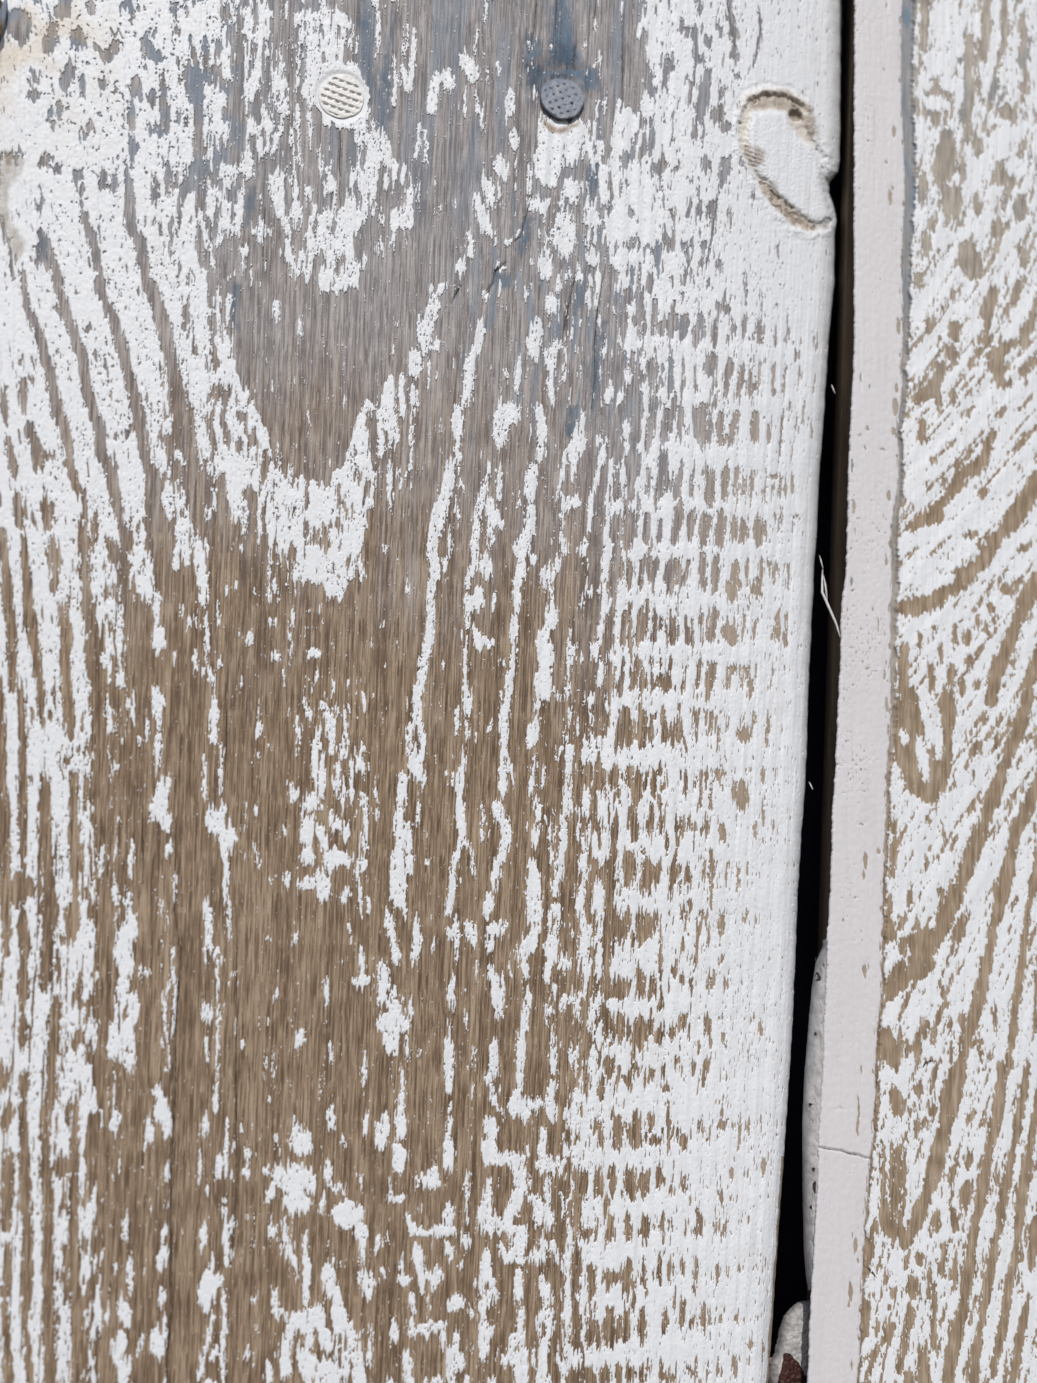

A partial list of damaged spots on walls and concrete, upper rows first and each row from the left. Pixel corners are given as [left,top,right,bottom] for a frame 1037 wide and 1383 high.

peeling [0,0,820,1383]
rust [778,1353,807,1383]
crack [820,1147,873,1199]
peeling [838,0,1037,1383]